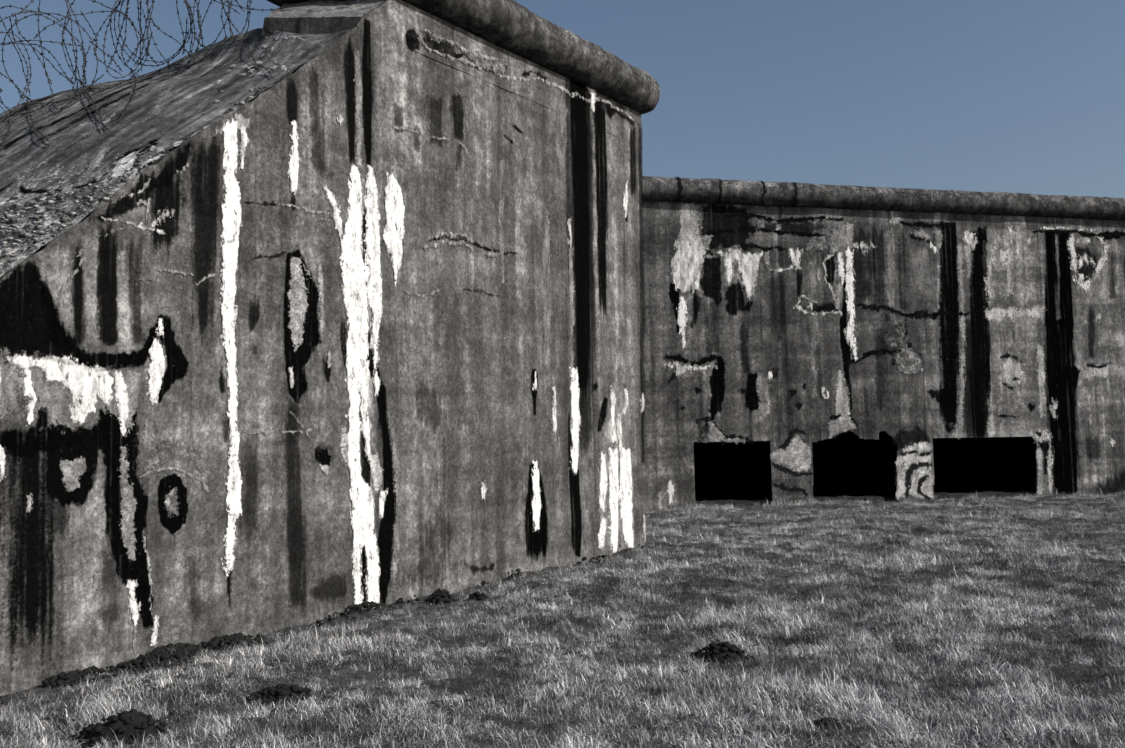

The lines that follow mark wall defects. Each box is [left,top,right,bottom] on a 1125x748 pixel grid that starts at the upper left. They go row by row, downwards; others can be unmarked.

leakage [0,60,210,177]
spalling [0,347,147,436]
leakage [0,113,260,671]
spalling [283,249,324,404]
crack [401,287,503,300]
crack [419,229,517,258]
leakage [551,79,645,557]
leakage [668,202,819,417]
spalling [696,203,877,317]
leakage [834,226,897,410]
leakage [927,221,1125,495]
crack [1032,226,1125,241]